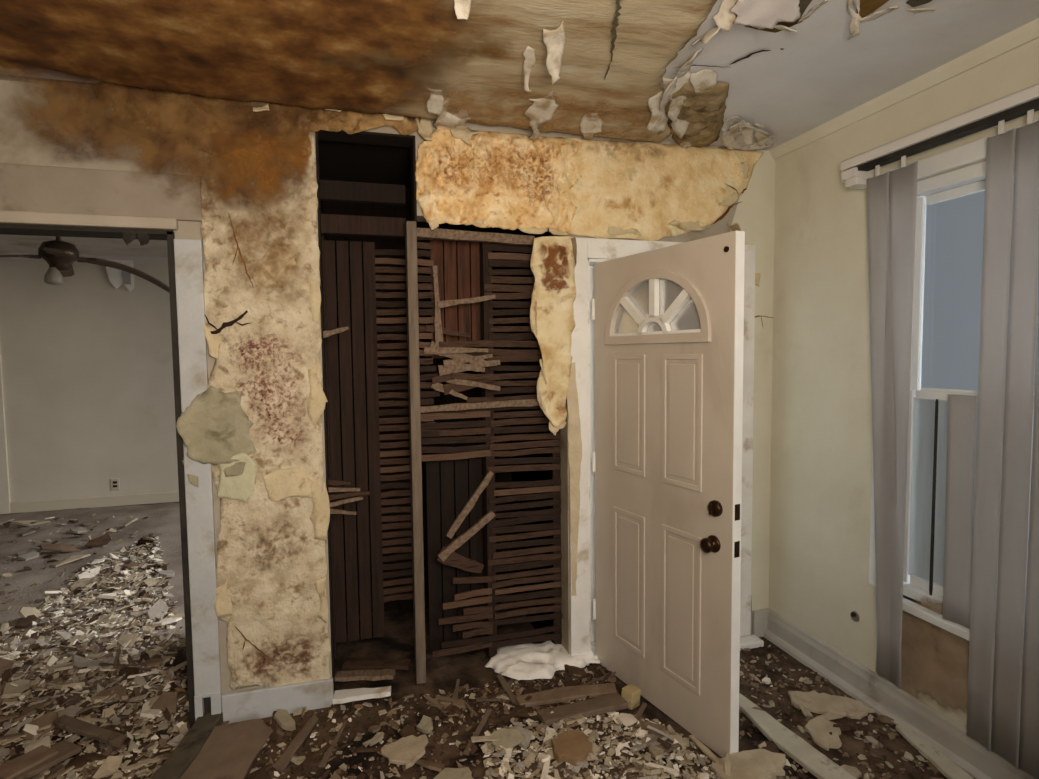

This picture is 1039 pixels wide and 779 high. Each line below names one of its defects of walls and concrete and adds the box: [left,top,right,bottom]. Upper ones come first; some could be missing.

crack [604,0,622,80]
peeling [847,0,936,40]
leakage [0,0,463,286]
crack [205,310,250,334]
crack [228,213,253,286]
peeling [383,0,828,596]
peeling [200,132,331,690]
leakage [239,338,302,446]